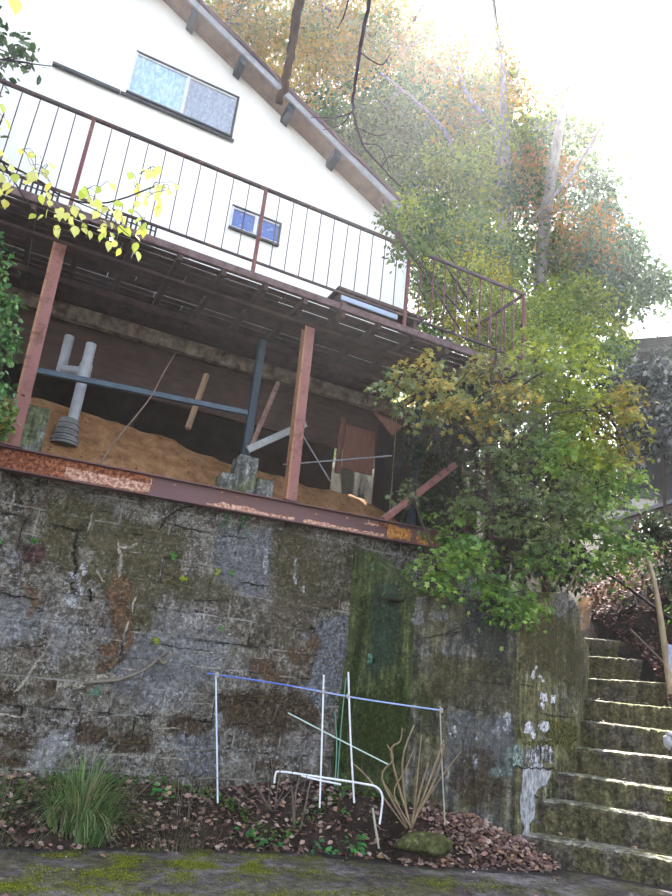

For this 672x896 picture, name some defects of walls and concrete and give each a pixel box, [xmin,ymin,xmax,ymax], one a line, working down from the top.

rust [0,448,153,494]
crack [0,512,27,539]
crack [168,523,247,555]
rust [206,492,438,547]
crack [51,524,92,603]
crack [0,592,40,600]
leakage [530,665,556,709]
leakage [524,721,549,739]